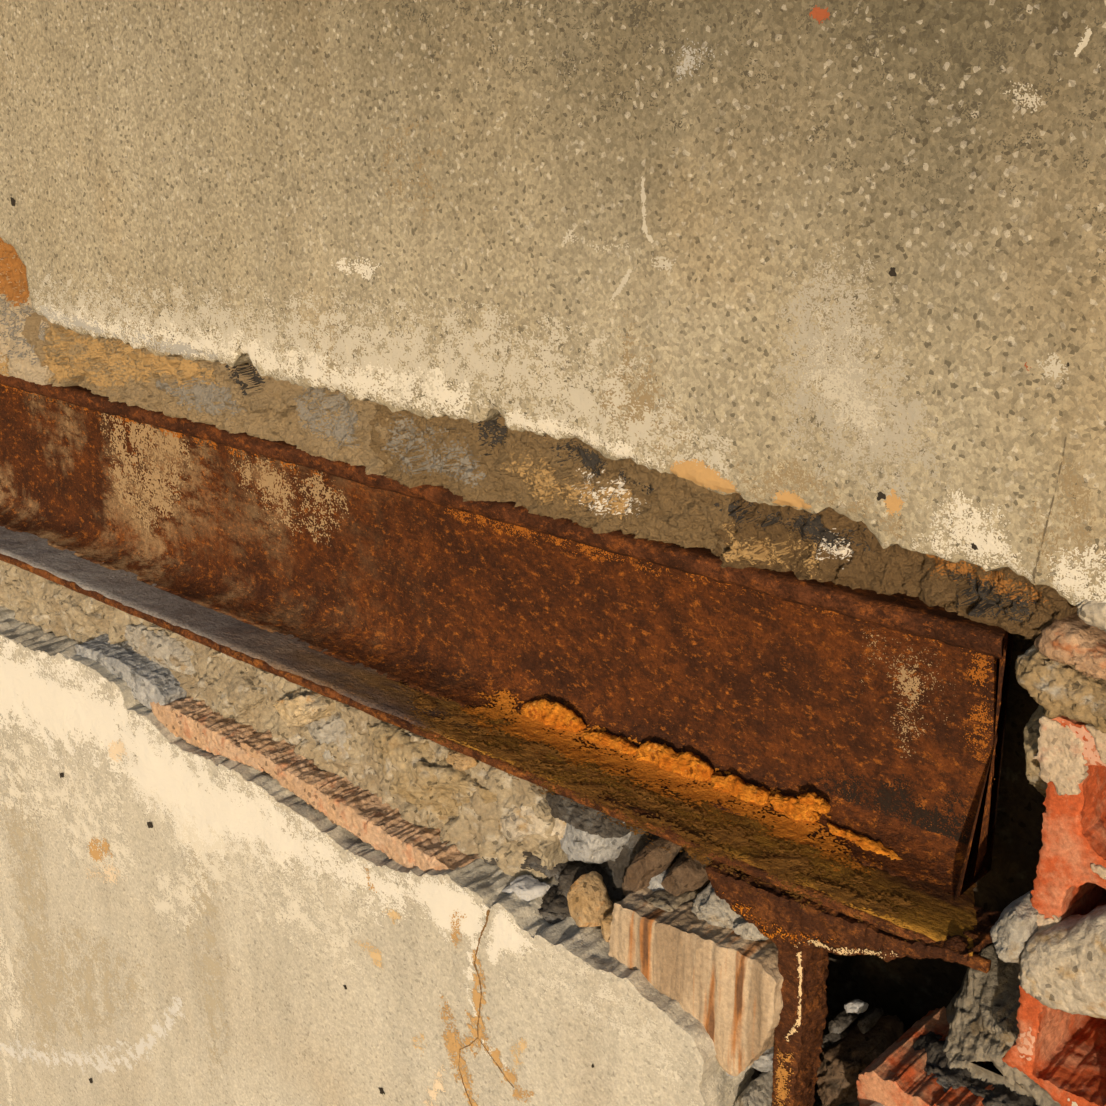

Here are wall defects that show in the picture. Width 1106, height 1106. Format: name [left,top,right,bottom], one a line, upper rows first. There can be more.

water stain [378,0,1106,243]
spalling [0,241,1078,639]
water stain [0,213,1106,626]
rust [500,448,633,521]
rust [444,508,773,598]
rust [722,522,831,580]
water stain [0,732,372,1106]
peeling [0,636,541,966]
rust [0,553,936,948]
crack [458,910,514,1106]
rust [773,1049,794,1106]
rust [958,647,996,782]